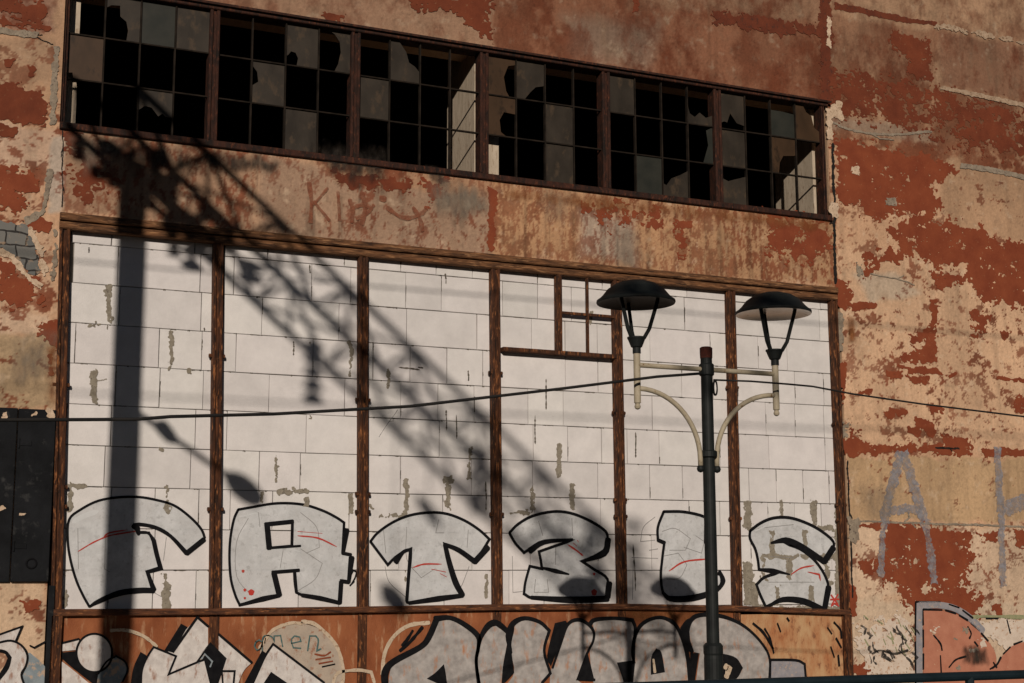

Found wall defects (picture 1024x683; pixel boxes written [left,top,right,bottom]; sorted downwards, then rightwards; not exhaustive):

peeling [0,0,52,31]
peeling [409,0,496,44]
peeling [0,58,50,138]
peeling [330,167,451,210]
peeling [486,186,498,252]
peeling [580,197,694,260]
peeling [711,0,1024,404]
peeling [0,164,58,376]
peeling [991,375,1024,414]
peeling [843,406,1024,458]
peeling [847,516,1003,620]
peeling [1013,528,1024,549]